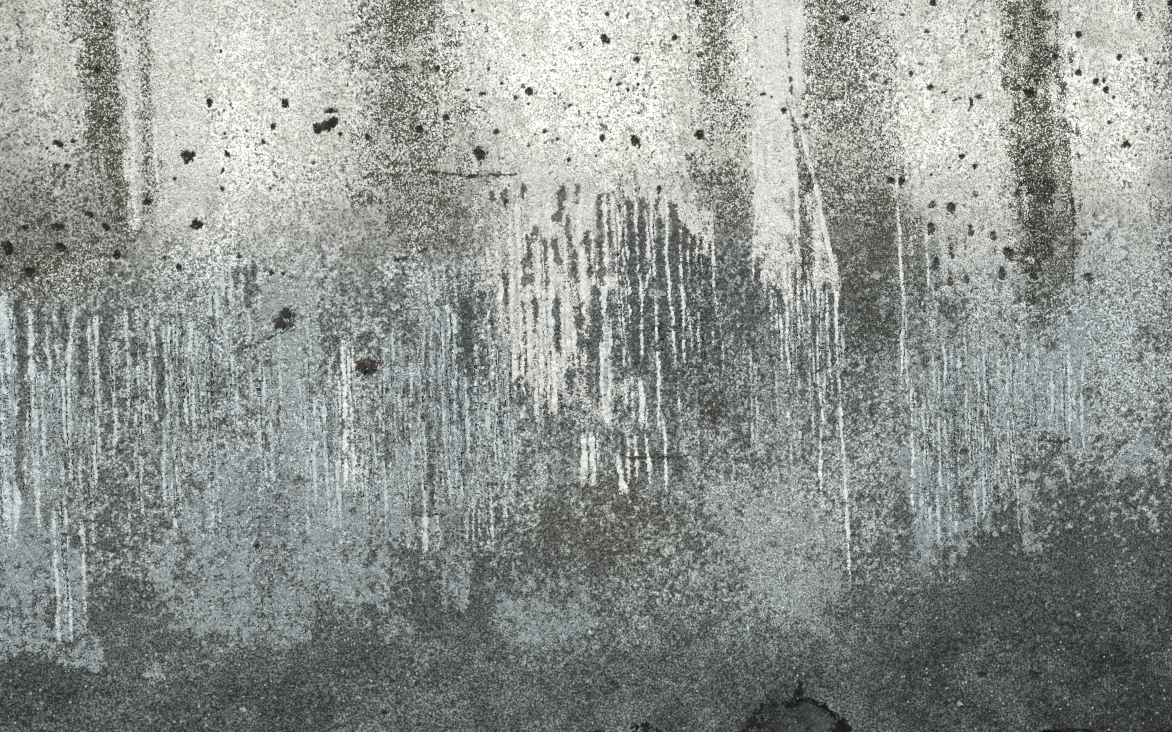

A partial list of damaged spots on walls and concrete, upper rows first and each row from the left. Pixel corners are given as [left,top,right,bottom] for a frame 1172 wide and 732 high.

damp [0,0,214,644]
damp [123,0,1088,612]
peeling [631,722,661,732]
spalling [763,698,853,732]